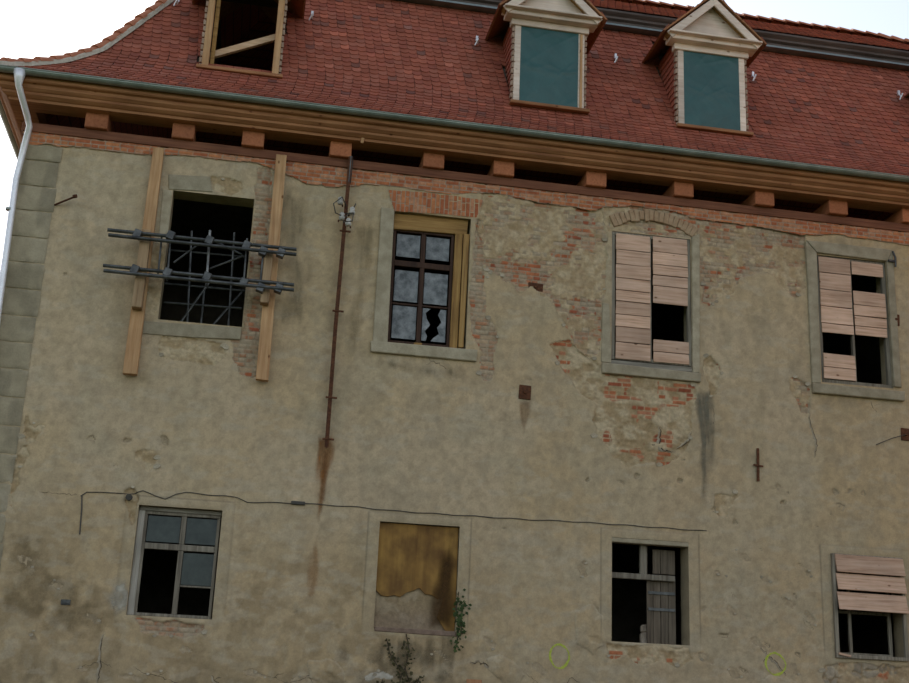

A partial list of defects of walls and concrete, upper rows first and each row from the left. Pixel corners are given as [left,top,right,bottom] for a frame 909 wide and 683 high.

spalling [231,167,274,378]
spalling [697,220,806,307]
spalling [477,192,724,485]
rust [318,440,331,507]
spalling [606,643,693,668]